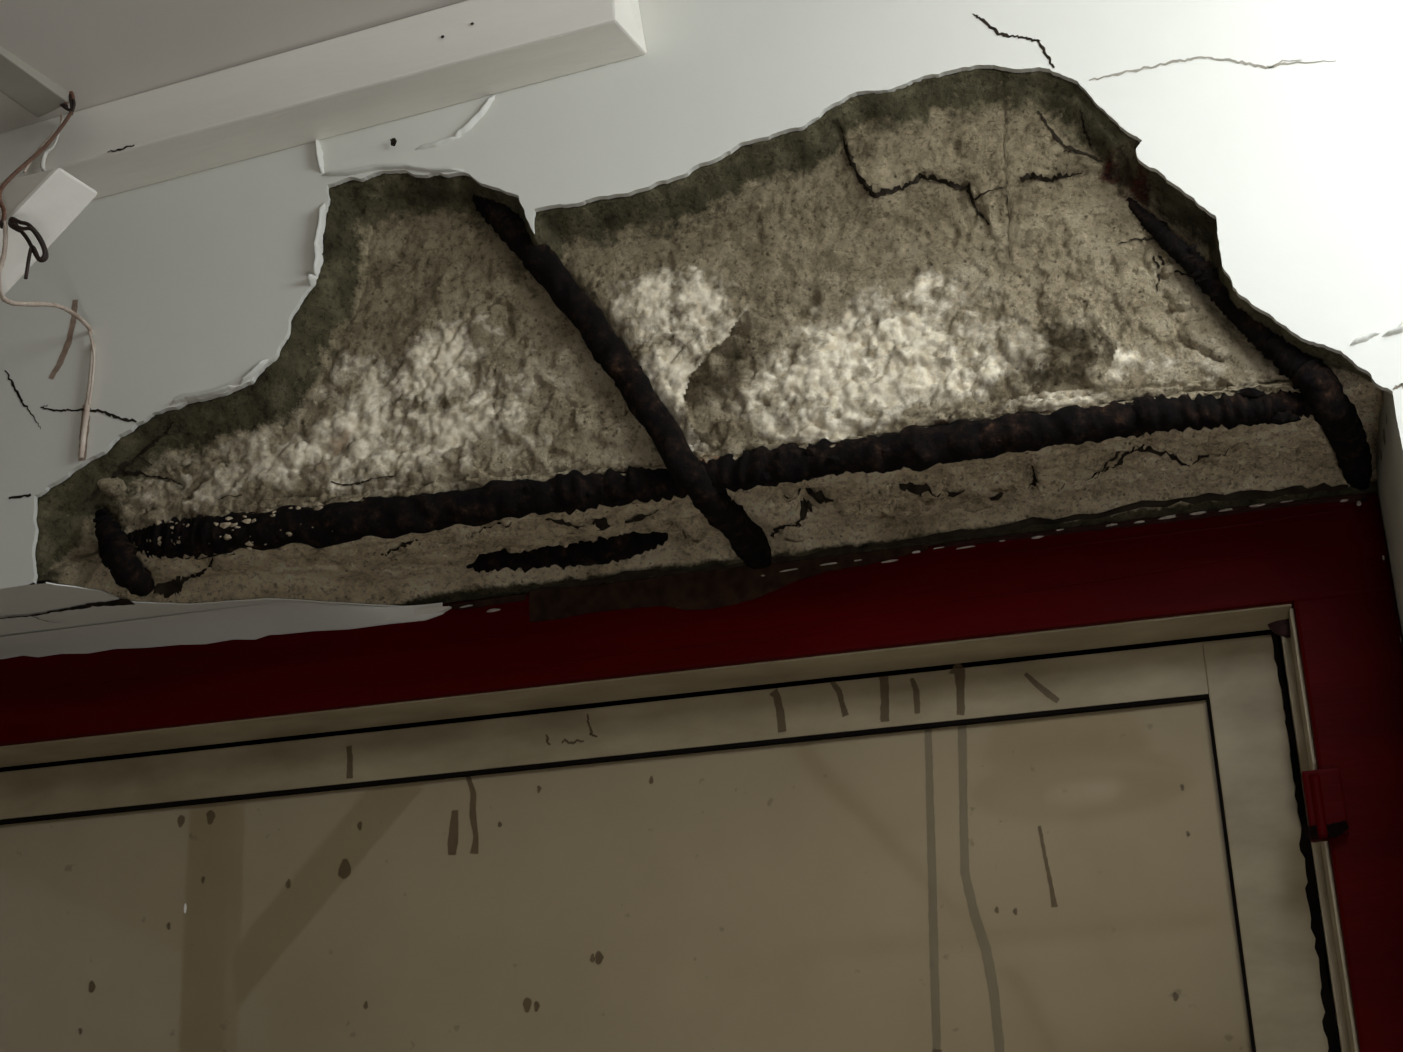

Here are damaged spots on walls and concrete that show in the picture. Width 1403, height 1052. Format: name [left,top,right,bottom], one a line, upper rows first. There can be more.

crack [973,14,1055,68]
crack [840,56,1332,258]
corrosion [1099,148,1163,205]
spalling [0,69,1383,659]